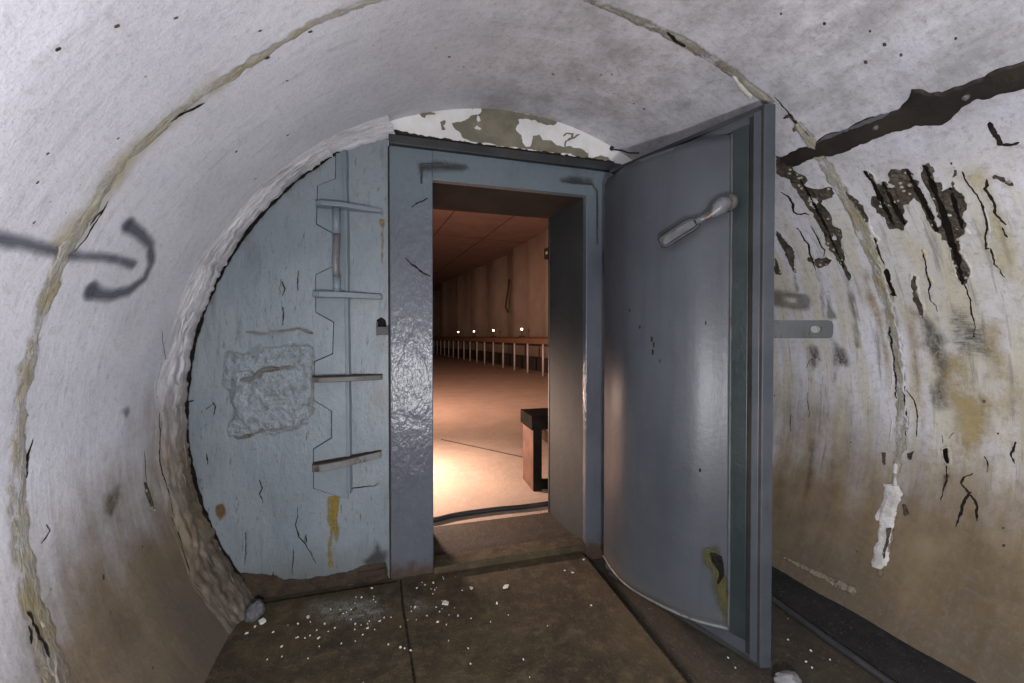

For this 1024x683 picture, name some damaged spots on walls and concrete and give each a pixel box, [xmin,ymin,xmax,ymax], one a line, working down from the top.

crack [171,103,205,122]
peeling [420,108,610,160]
crack [987,122,1019,146]
spalling [992,175,1015,187]
crack [781,192,825,270]
spalling [774,156,973,285]
crack [962,171,1008,278]
spalling [883,265,897,297]
crack [921,249,938,312]
rust [185,151,389,599]
water stain [924,319,984,444]
crack [940,432,1017,526]